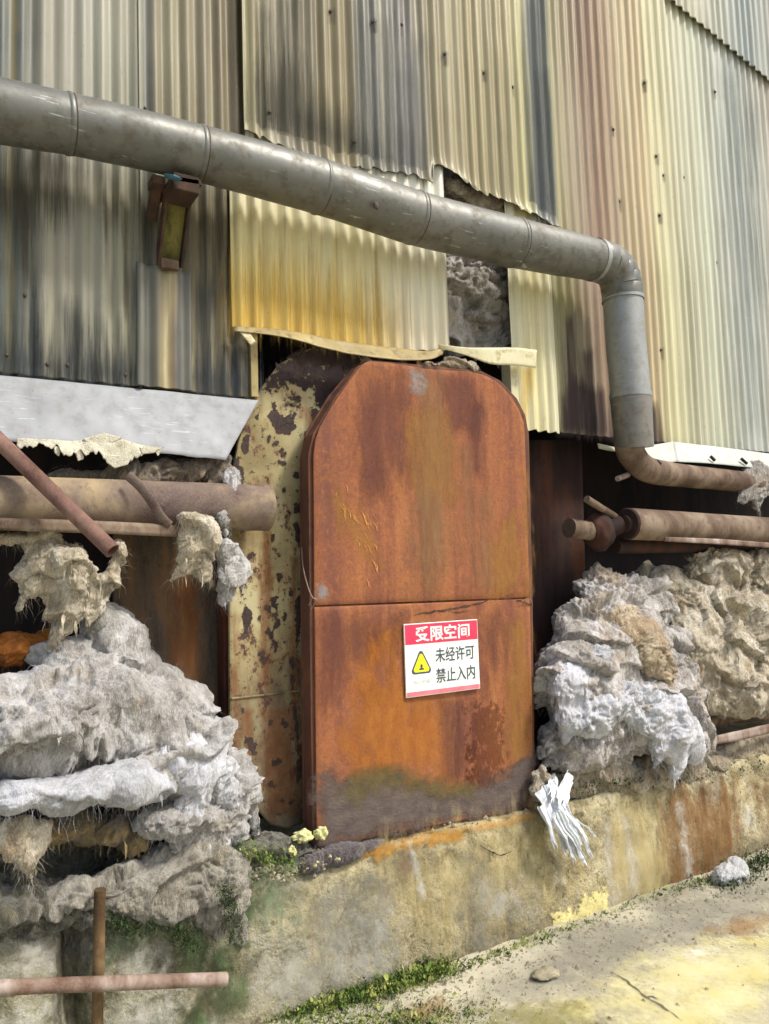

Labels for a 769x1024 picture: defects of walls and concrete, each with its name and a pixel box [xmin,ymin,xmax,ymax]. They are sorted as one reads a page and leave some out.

peeling [17,433,164,468]
peeling [234,434,250,484]
peeling [287,503,300,547]
peeling [240,573,301,741]
peeling [244,737,258,756]
leakage [312,756,535,858]
rust [660,788,739,885]
leakage [109,924,247,1024]